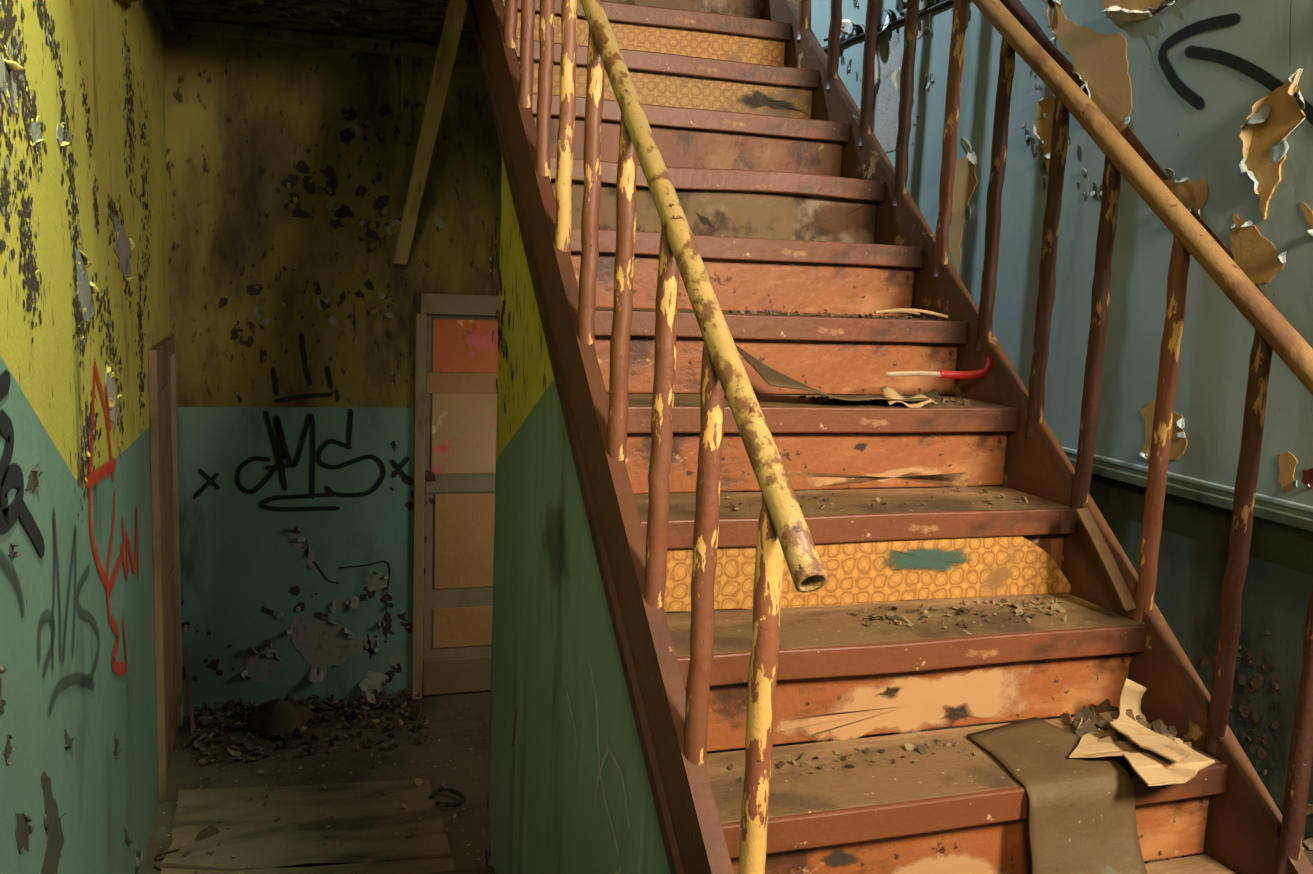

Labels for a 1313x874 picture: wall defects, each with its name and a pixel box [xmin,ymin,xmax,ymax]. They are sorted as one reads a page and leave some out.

peeling [1042,0,1176,133]
peeling [0,0,151,522]
peeling [1229,69,1306,285]
peeling [1301,202,1313,238]
peeling [389,470,436,511]
peeling [182,571,412,692]
peeling [2,734,18,765]
peeling [15,772,65,874]